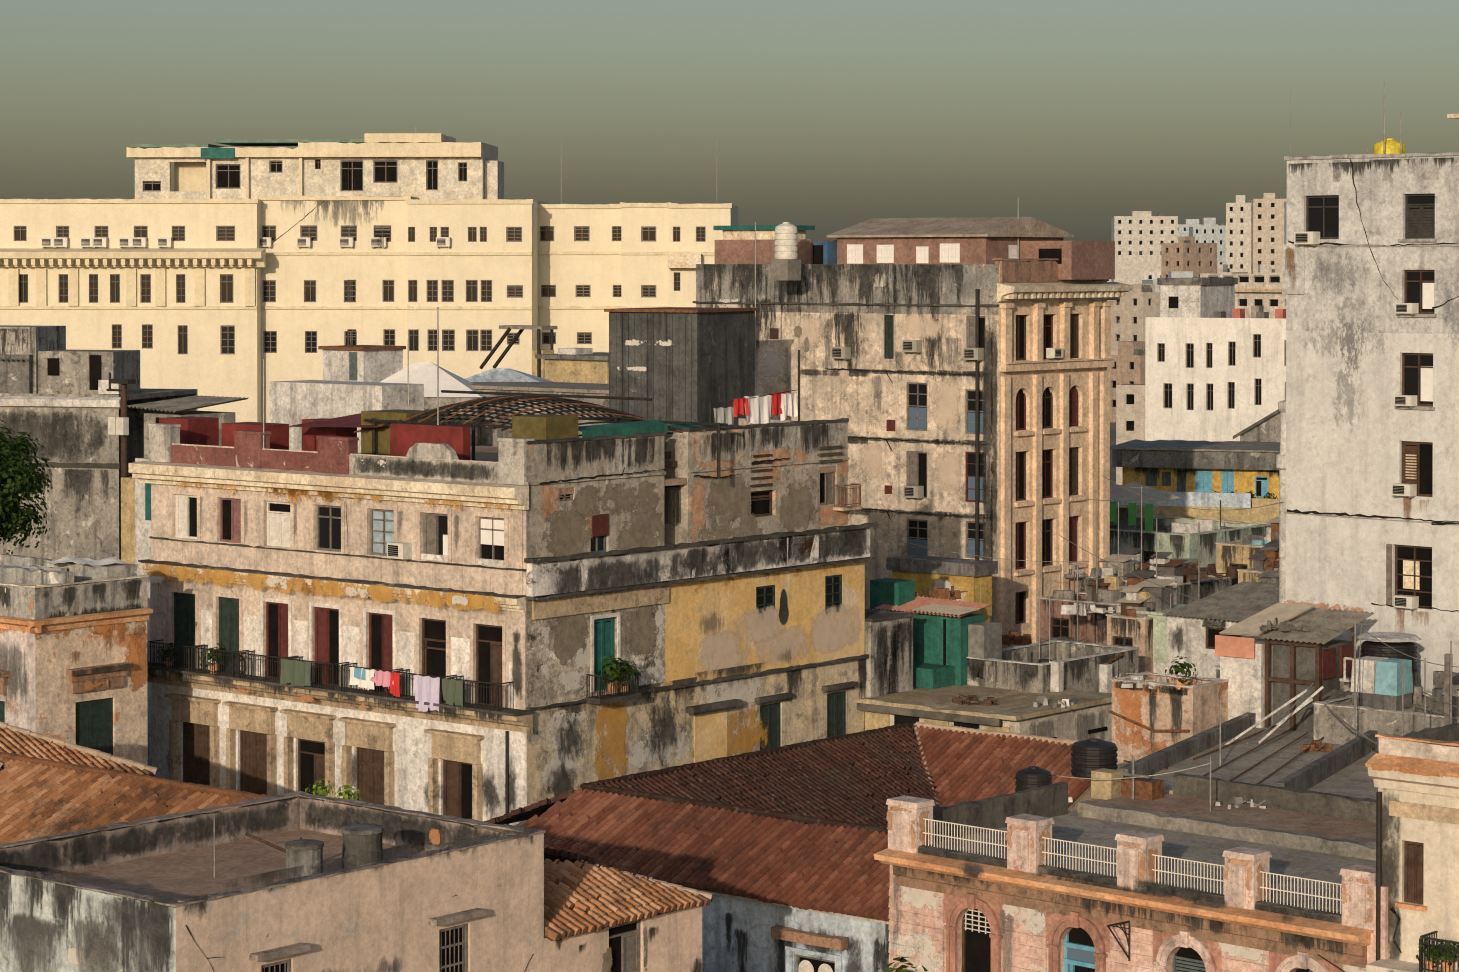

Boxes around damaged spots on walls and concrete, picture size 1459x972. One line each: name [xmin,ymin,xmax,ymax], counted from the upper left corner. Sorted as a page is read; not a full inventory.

crack [1288,159,1459,309]
water stain [547,264,998,599]
flaking render [690,448,852,552]
peeling [736,606,785,642]
water stain [547,703,582,797]
peeling [540,603,694,787]
water stain [634,663,762,766]
peeling [703,676,768,757]
water stain [305,770,536,868]
water stain [0,803,288,972]
peeling [1002,904,1046,936]
peeling [1218,942,1265,961]